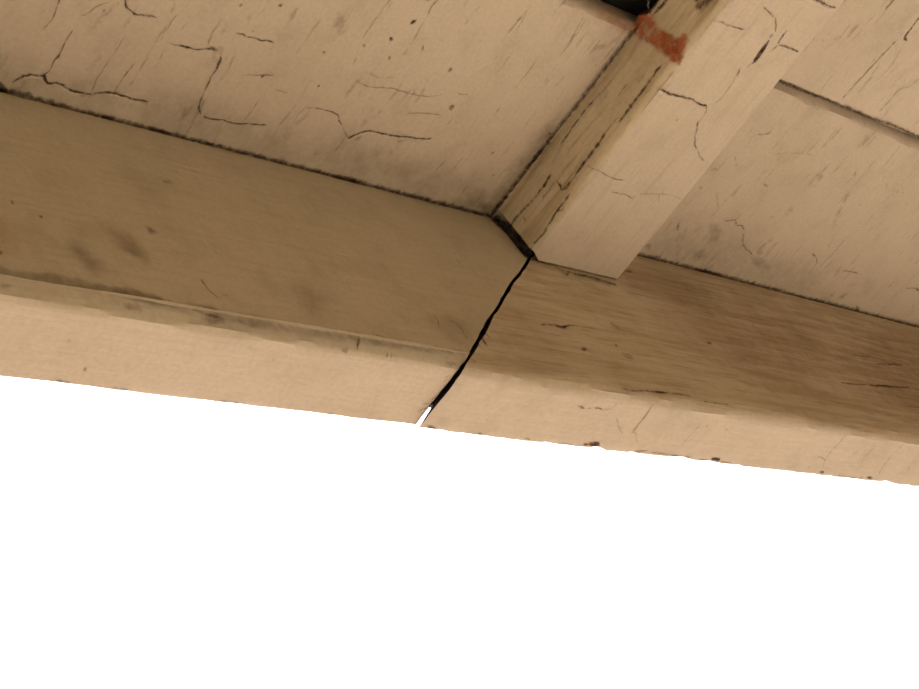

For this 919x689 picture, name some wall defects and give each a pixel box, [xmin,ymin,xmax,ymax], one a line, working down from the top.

crack [12,31,148,105]
crack [179,45,265,125]
corrosion [633,15,686,64]
crack [753,8,814,63]
crack [850,18,919,90]
crack [316,108,431,142]
crack [511,67,707,244]